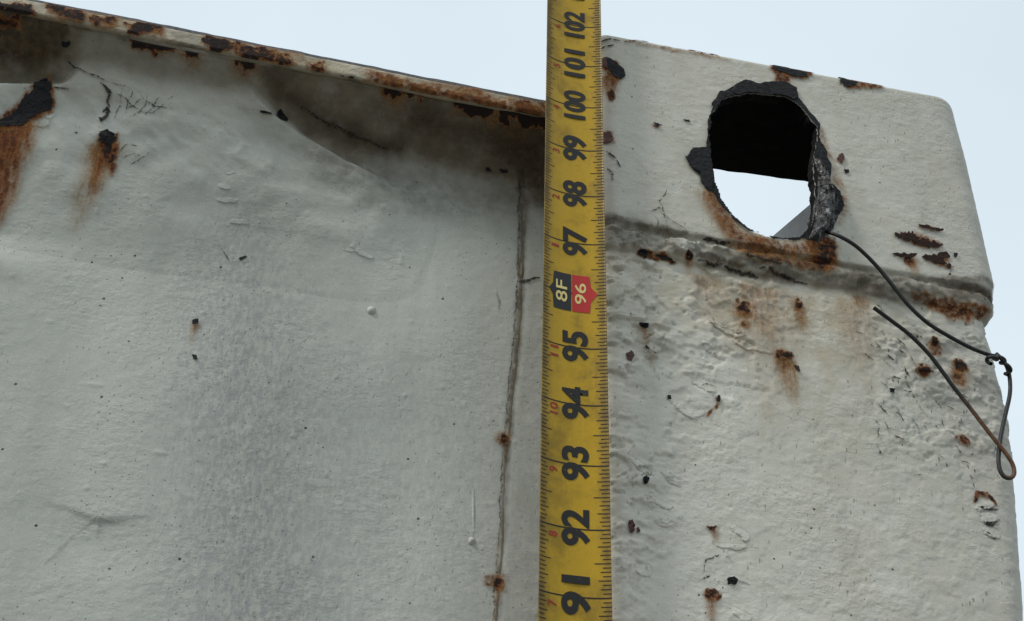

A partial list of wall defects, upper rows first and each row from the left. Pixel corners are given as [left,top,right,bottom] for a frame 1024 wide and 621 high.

rust [0,0,326,76]
crack [54,61,169,122]
rust [363,69,546,130]
peeling [602,57,626,101]
rust [0,122,33,220]
rust [88,129,119,199]
peeling [685,65,850,240]
rust [703,192,838,271]
rust [735,298,751,328]
rust [916,336,942,377]
rust [951,358,969,385]
rust [704,588,722,615]